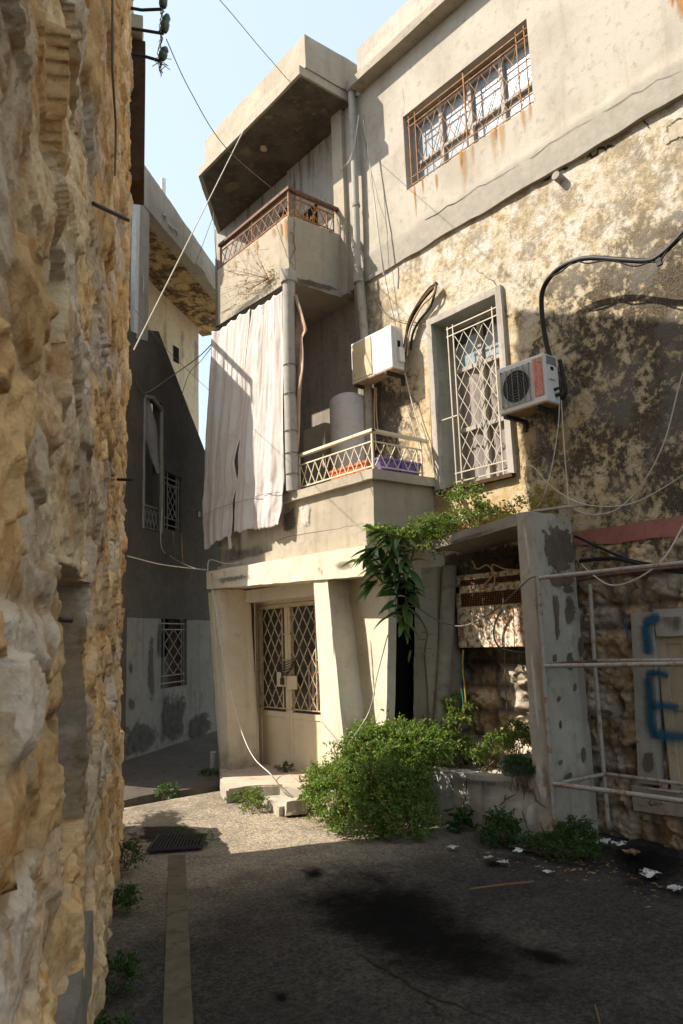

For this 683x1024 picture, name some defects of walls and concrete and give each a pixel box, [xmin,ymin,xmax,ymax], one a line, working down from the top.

peeling [542,522,577,640]
leakage [124,693,212,756]